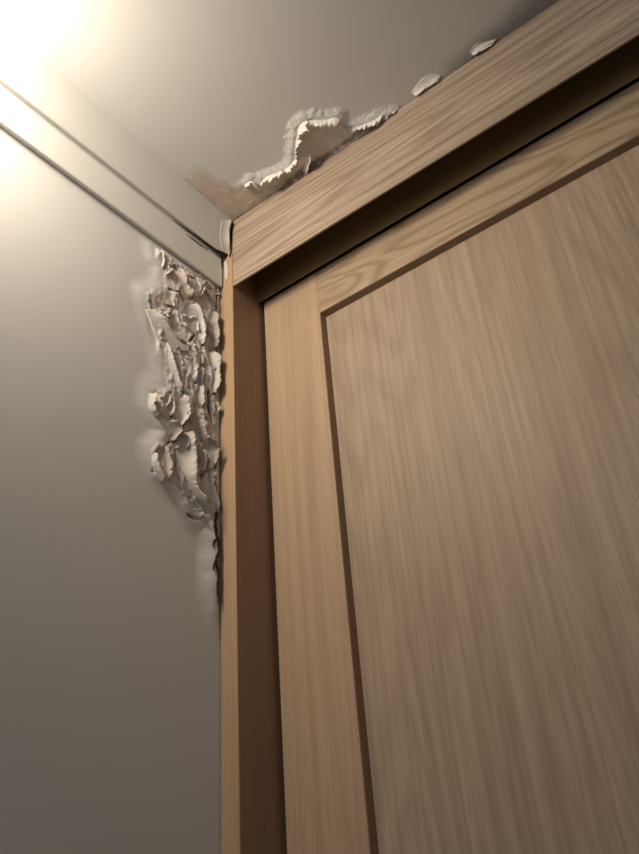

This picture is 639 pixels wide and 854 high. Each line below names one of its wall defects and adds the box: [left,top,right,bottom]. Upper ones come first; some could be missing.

peeling [411,74,440,96]
peeling [470,39,496,55]
peeling [220,102,401,254]
peeling [128,233,221,539]
crack [212,512,221,602]